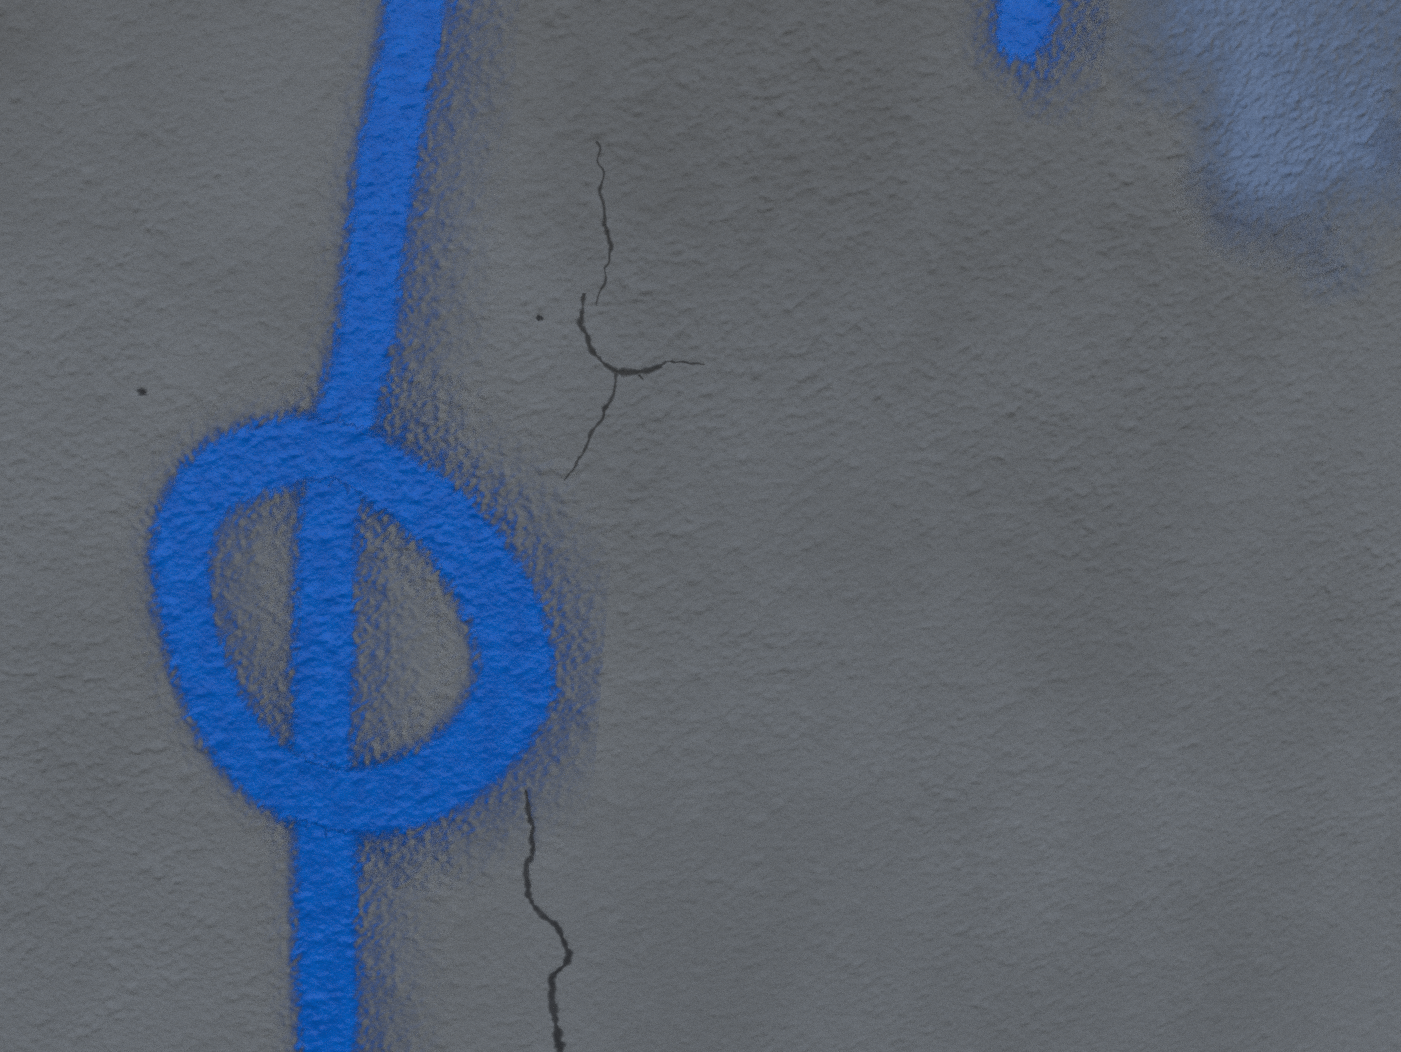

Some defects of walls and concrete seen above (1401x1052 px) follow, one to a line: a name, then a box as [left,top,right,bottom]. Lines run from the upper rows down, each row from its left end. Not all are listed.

crack [564,141,704,480]
crack [524,790,573,1052]